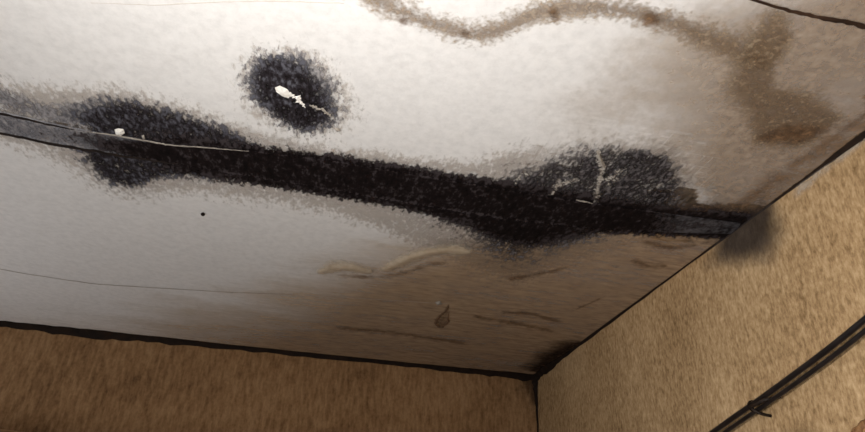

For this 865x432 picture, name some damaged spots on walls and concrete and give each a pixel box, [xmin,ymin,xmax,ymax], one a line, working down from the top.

crack [750,0,865,29]
peeling [275,86,331,117]
damp [0,0,865,262]
damp [203,232,720,374]